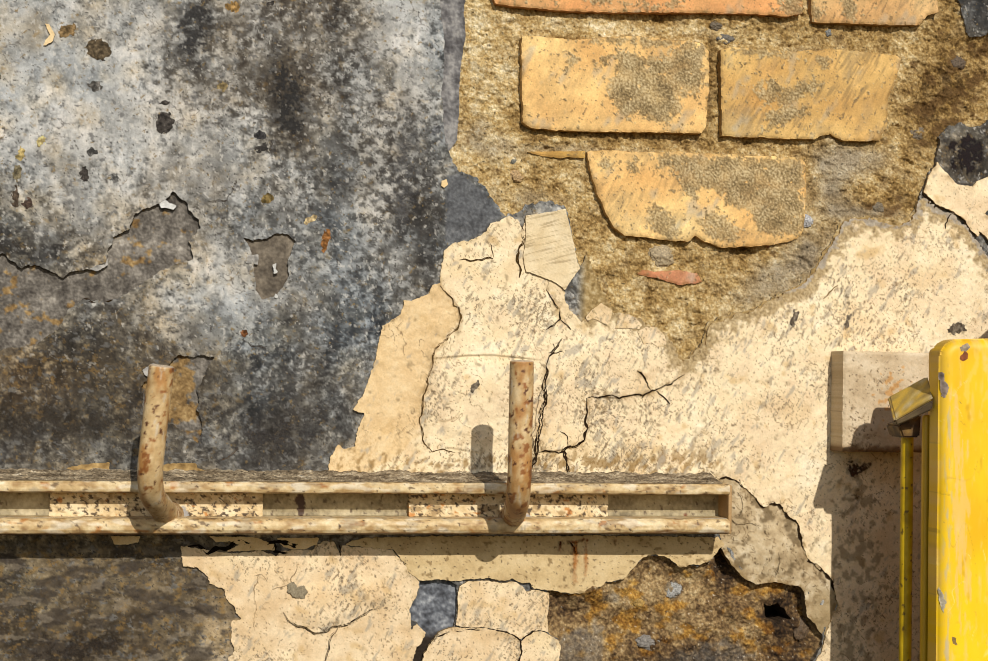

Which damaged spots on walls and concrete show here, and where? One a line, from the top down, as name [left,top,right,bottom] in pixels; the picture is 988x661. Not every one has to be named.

peeling [225,1,240,13]
peeling [254,130,269,153]
peeling [0,192,200,350]
peeling [244,234,295,300]
peeling [321,229,331,253]
crack [460,226,525,278]
spalling [328,0,988,661]
crack [419,287,462,452]
crack [532,290,685,472]
spalling [181,534,821,661]
crack [436,604,540,661]